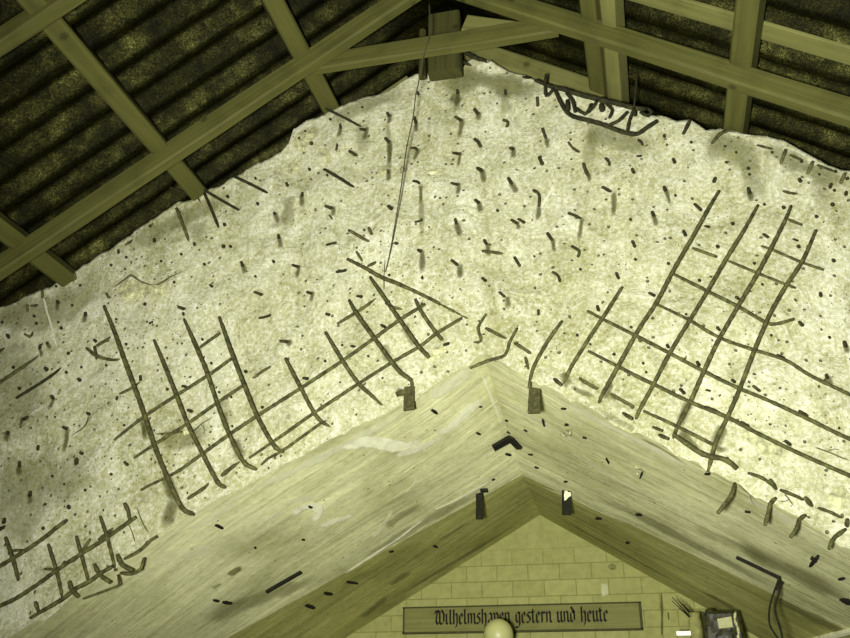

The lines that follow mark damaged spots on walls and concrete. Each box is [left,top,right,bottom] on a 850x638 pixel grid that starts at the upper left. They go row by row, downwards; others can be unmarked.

spalling [346,251,468,319]
peeling [432,314,563,398]
spalling [263,433,312,458]
peeling [343,399,481,457]
spalling [742,426,786,459]
peeling [292,503,353,527]
spalling [716,482,737,514]
spalling [747,472,850,550]